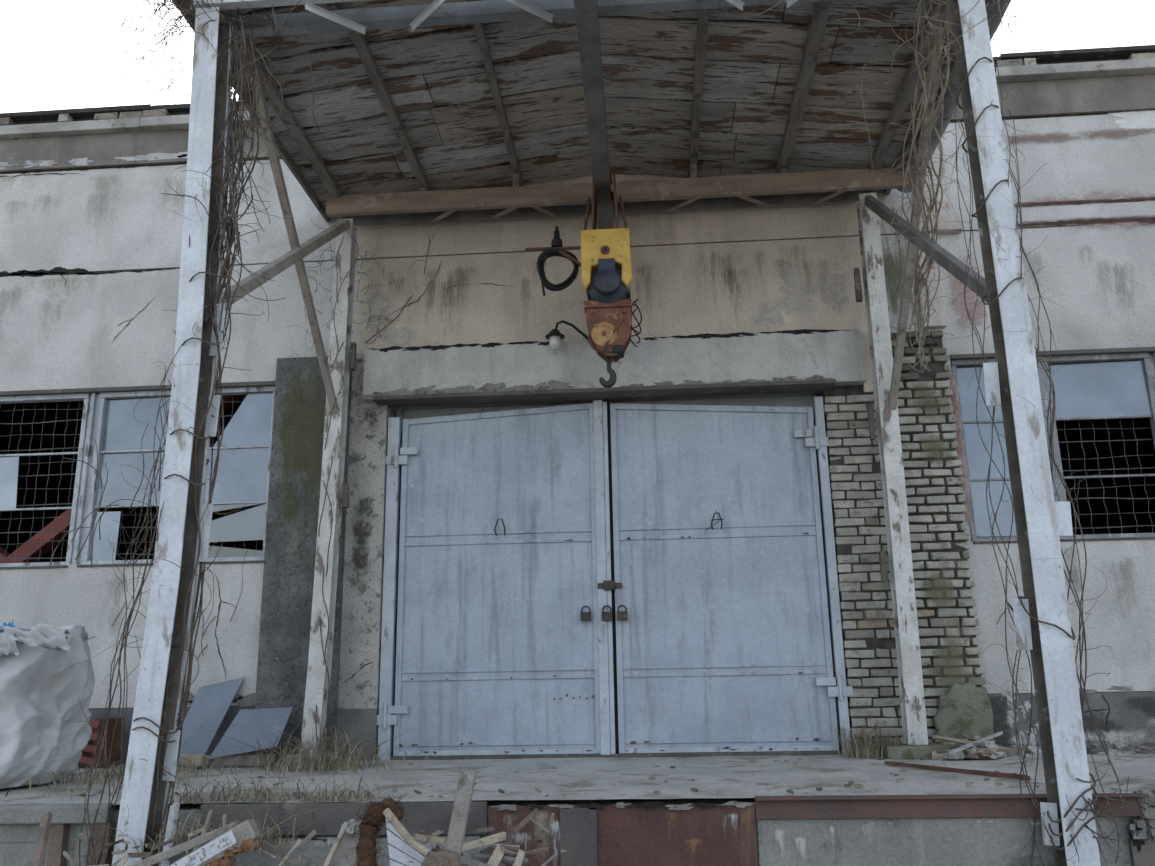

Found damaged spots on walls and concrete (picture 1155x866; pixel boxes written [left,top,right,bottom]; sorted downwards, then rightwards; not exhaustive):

peeling [1107,110,1155,130]
peeling [0,158,95,170]
peeling [110,152,188,161]
corrosion [1014,193,1155,228]
crack [0,267,178,285]
crack [640,329,839,340]
water stain [283,382,324,484]
water stain [353,498,372,576]
corrosion [488,802,758,866]